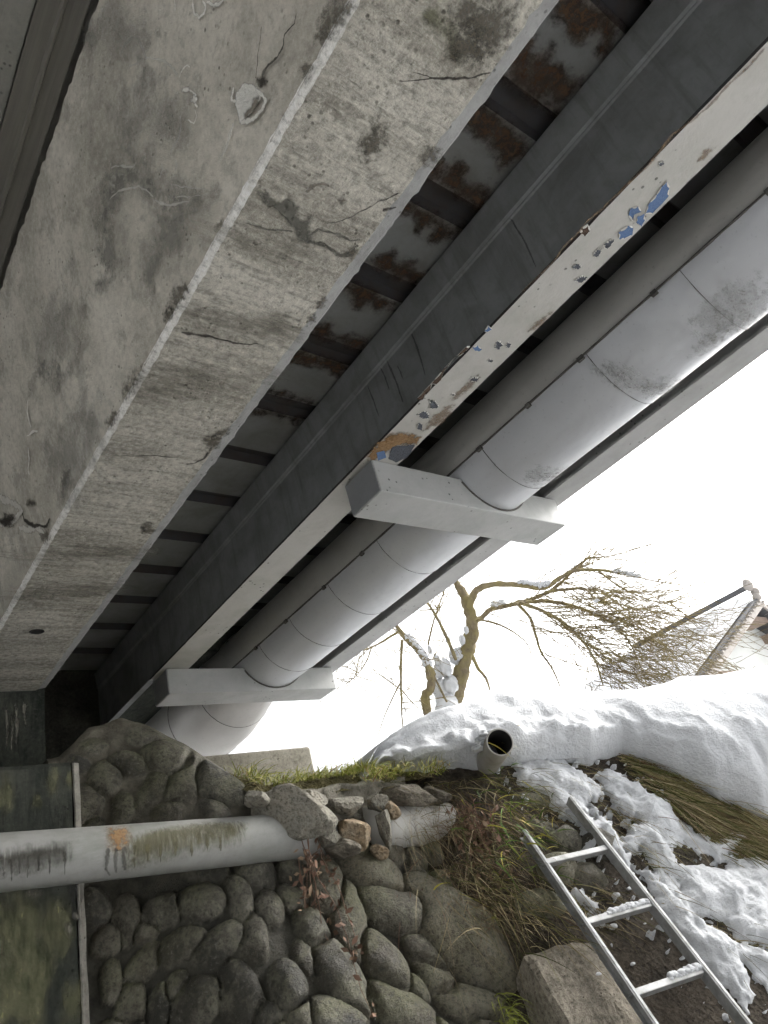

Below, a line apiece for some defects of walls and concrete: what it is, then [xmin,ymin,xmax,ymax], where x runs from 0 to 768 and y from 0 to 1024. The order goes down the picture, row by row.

rust [551,0,619,57]
spalling [220,16,296,160]
crack [402,72,490,82]
rust [502,34,583,118]
rust [462,103,528,171]
rust [427,156,490,212]
crack [247,192,398,257]
peeling [593,182,670,258]
peeling [572,264,588,283]
crack [182,332,257,345]
leakage [0,844,71,881]
leakage [128,823,242,867]